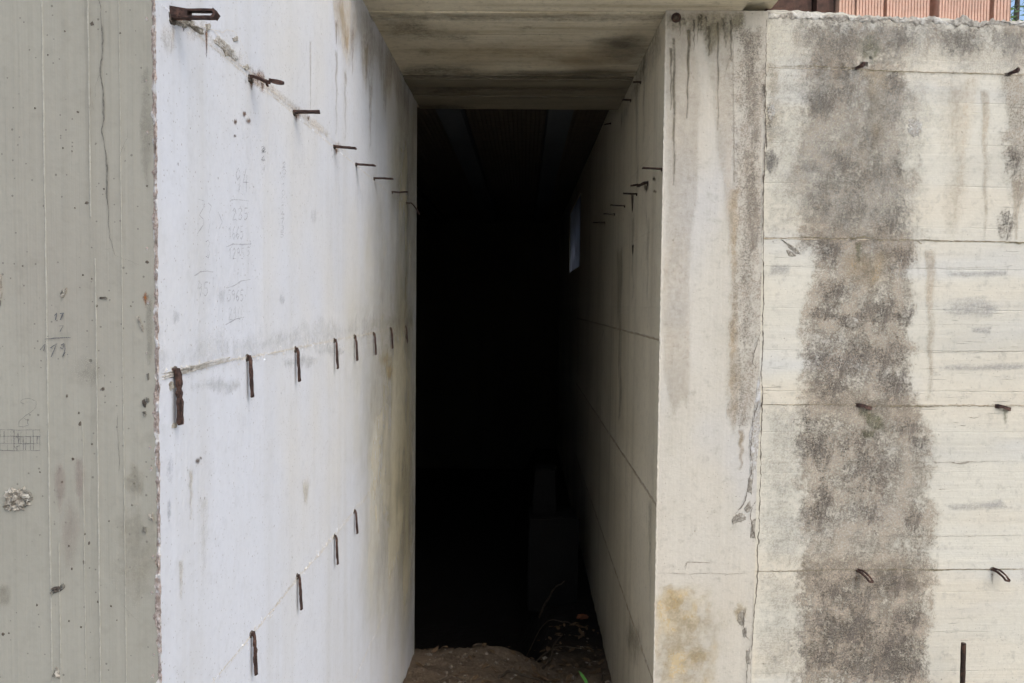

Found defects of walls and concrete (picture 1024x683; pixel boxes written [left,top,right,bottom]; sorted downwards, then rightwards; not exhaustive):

crack [86,1,139,265]
leakage [670,15,778,346]
crack [677,20,1024,683]
leakage [789,19,1024,683]